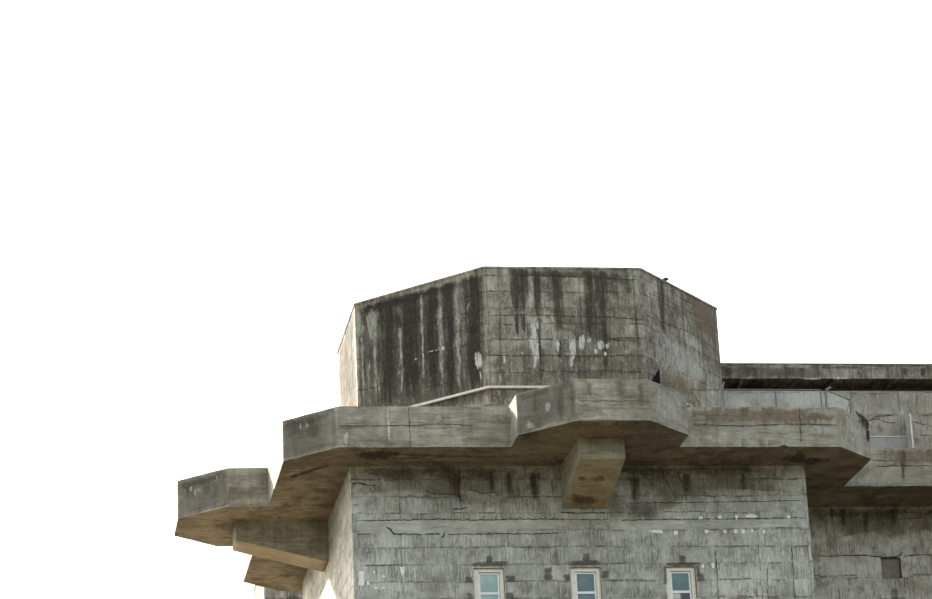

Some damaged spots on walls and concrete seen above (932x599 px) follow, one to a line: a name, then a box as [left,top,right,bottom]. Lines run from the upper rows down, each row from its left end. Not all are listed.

damp [511,269,623,371]
damp [340,277,484,439]
damp [360,451,399,460]
damp [530,473,538,498]
crack [357,470,806,538]